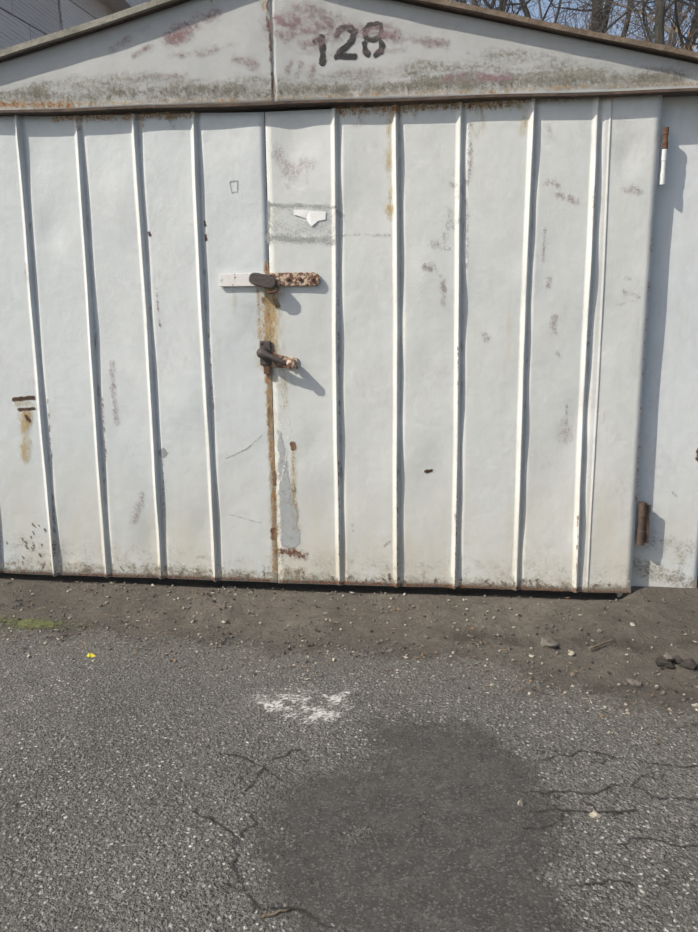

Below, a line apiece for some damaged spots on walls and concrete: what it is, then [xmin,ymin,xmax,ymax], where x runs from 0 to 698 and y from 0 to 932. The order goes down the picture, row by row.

rust [0,100,200,126]
rust [257,289,280,353]
peeling [277,413,300,548]
rust [0,374,631,593]